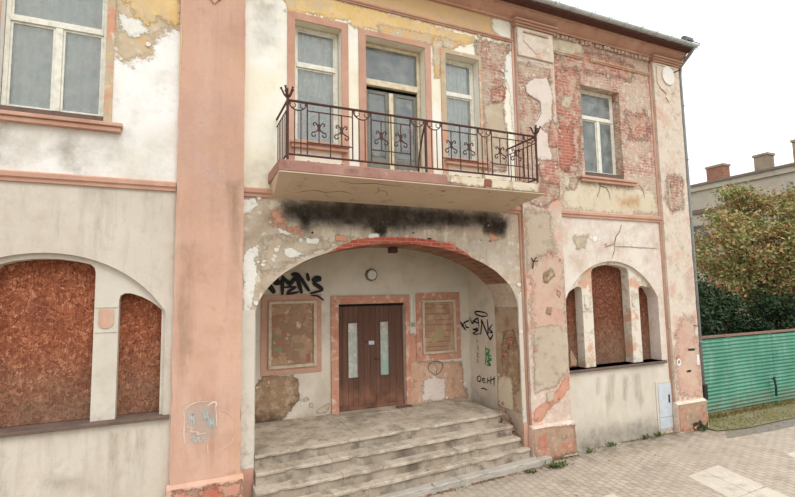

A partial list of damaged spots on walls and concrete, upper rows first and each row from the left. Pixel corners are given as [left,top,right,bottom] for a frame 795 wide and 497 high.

peeling [115,0,181,69]
flaking render [620,108,652,142]
peeling [243,197,261,214]
crack [303,181,401,198]
peeling [283,0,637,406]
leakage [484,223,506,234]
peeling [243,209,507,310]
peeling [673,314,709,431]
spalling [255,375,330,423]
spalling [533,350,577,459]
spalling [171,479,243,497]